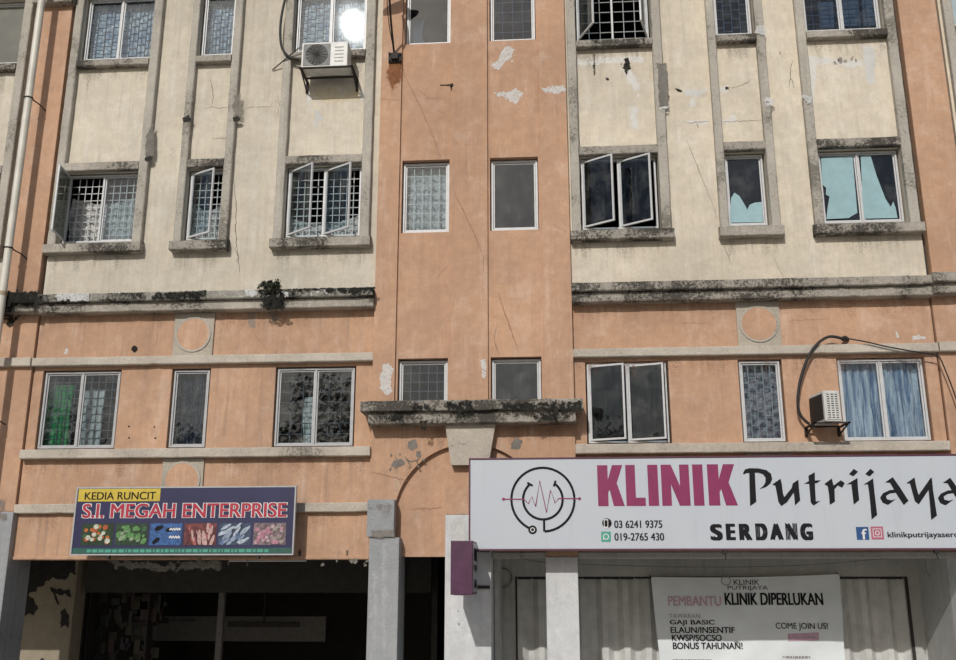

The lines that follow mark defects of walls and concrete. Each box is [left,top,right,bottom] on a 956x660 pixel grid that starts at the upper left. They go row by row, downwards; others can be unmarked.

peeling [492,46,515,70]
peeling [495,89,524,105]
peeling [540,85,566,94]
damp [151,252,226,302]
damp [4,289,40,327]
damp [215,287,376,332]
crack [494,293,519,355]
peeling [379,363,394,395]
damp [374,399,474,446]
damp [501,400,582,444]
peeling [25,560,76,628]